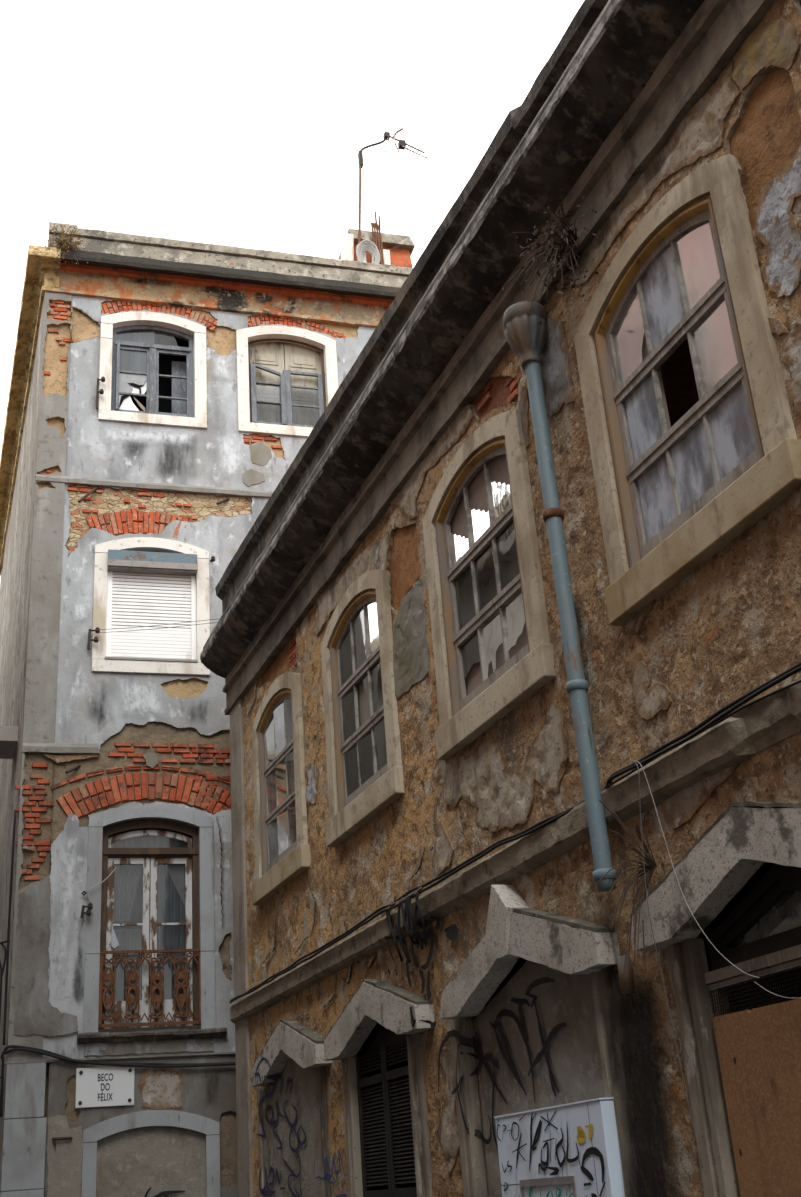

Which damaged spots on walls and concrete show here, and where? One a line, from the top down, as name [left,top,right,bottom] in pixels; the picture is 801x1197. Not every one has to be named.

peeling [553,0,801,297]
spalling [42,299,359,398]
peeling [768,318,801,418]
spalling [46,416,66,440]
spalling [36,433,285,556]
spalling [161,678,208,699]
spalling [13,721,232,1037]